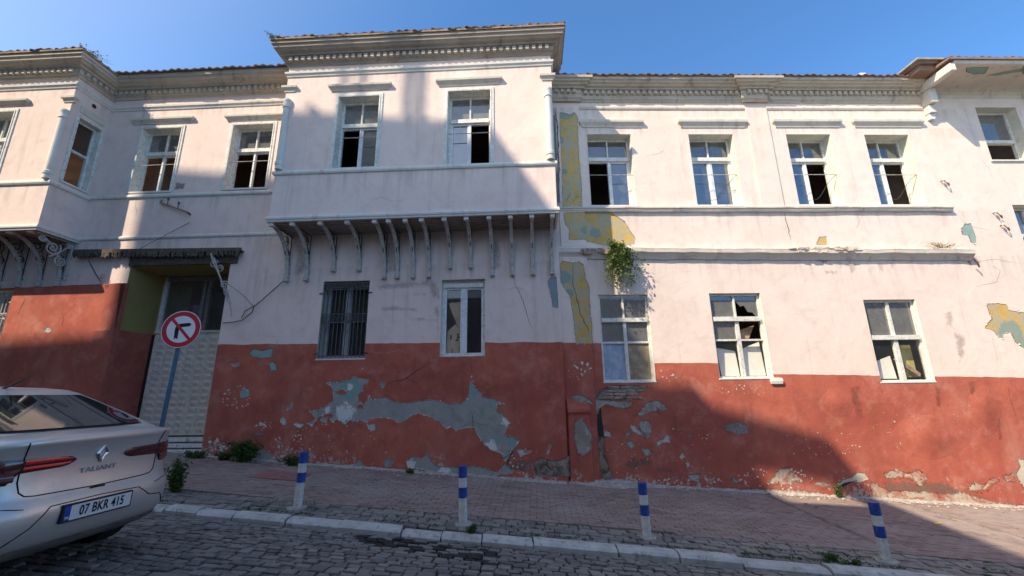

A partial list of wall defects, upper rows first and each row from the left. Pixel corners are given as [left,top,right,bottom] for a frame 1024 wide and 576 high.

peeling [547,112,635,345]
peeling [961,223,977,244]
peeling [985,302,1024,348]
peeling [249,348,277,371]
peeling [253,361,813,490]
spalling [837,472,1023,506]
spalling [1015,458,1024,488]